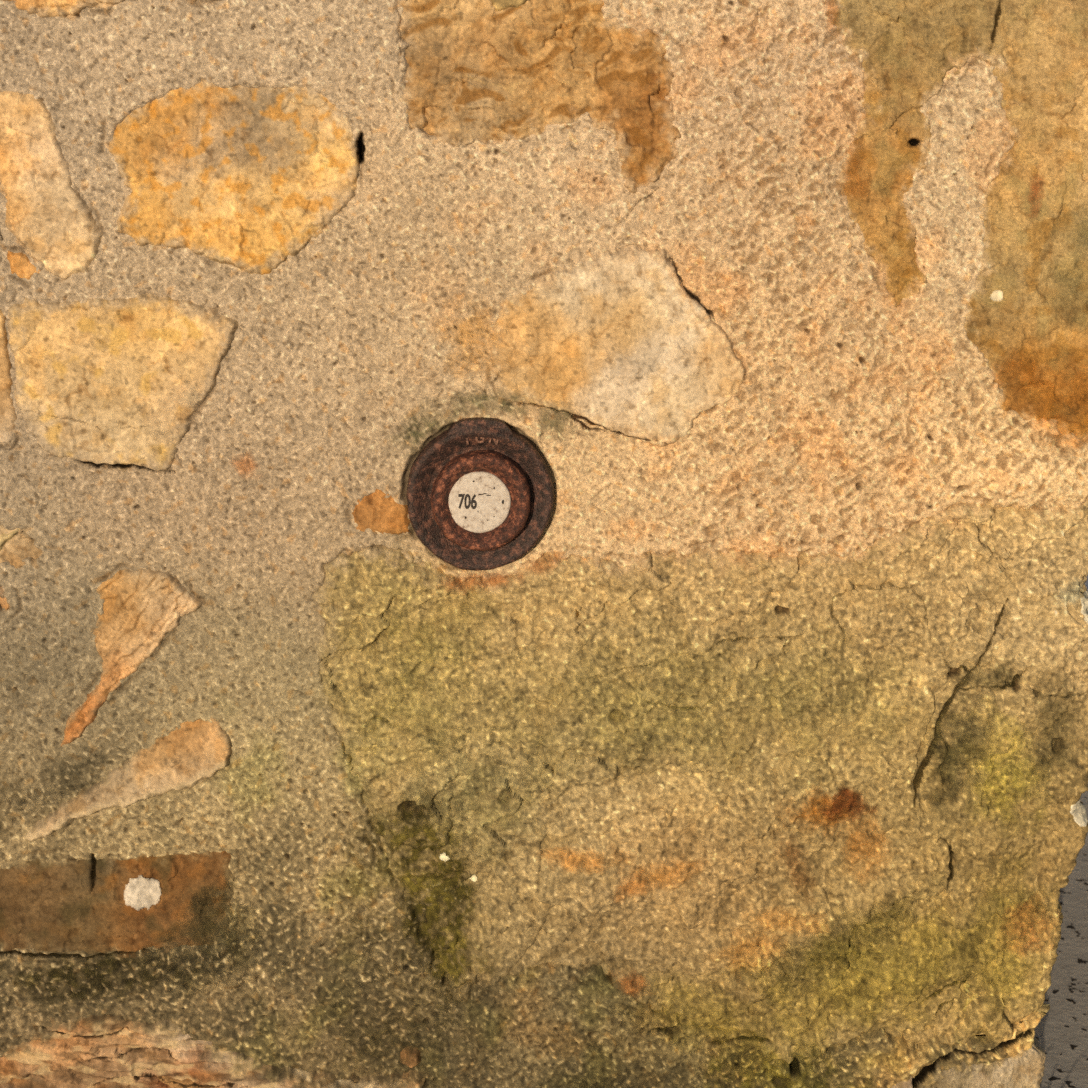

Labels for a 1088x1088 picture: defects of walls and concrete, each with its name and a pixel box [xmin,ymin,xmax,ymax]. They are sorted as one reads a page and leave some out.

crack [672,260,713,316]
crack [913,598,1021,805]